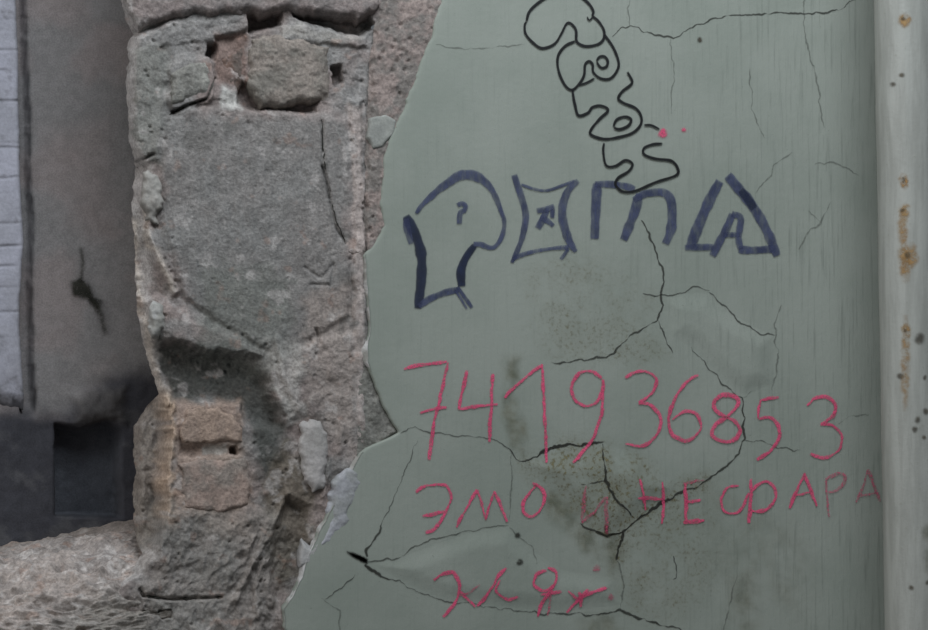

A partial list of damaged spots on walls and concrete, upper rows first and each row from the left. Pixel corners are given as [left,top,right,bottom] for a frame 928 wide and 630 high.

crack [613,0,852,39]
corrosion [900,206,917,274]
flaking render [72,249,106,331]
spalling [119,0,442,630]
crack [326,220,796,630]